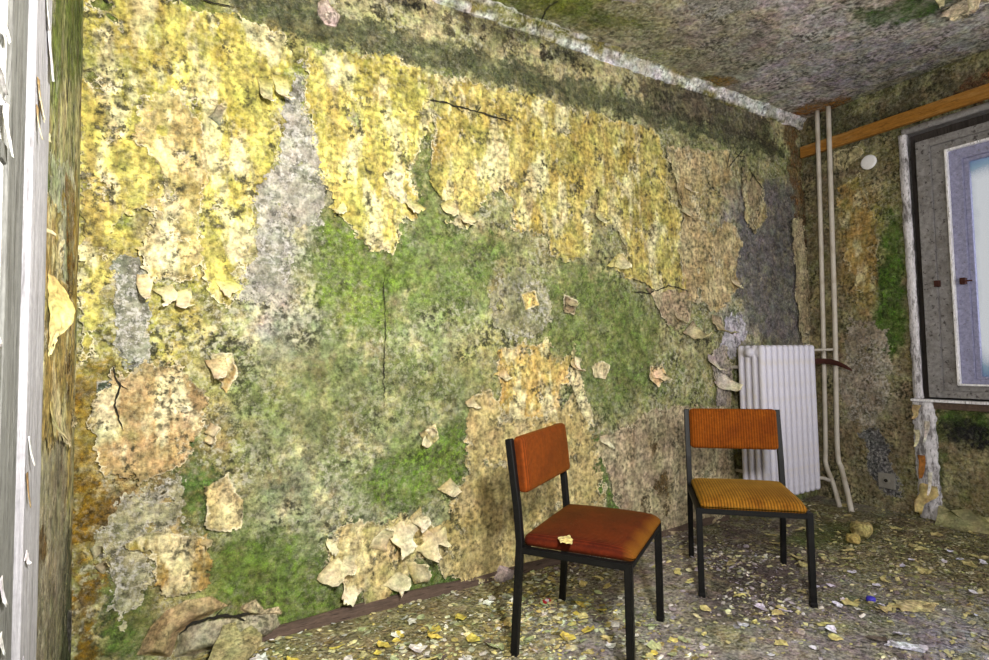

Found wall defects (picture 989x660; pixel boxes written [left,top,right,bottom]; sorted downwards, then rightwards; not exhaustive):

flaking render [317,0,340,27]
peeling [935,0,989,22]
crack [426,99,513,122]
water stain [232,0,786,162]
flaking render [215,59,347,306]
peeling [441,199,477,225]
flaking render [839,317,904,498]
water stain [940,419,989,452]
peeling [437,478,462,497]
flaking render [89,476,187,632]
peeling [317,538,363,606]
peeling [368,507,451,598]